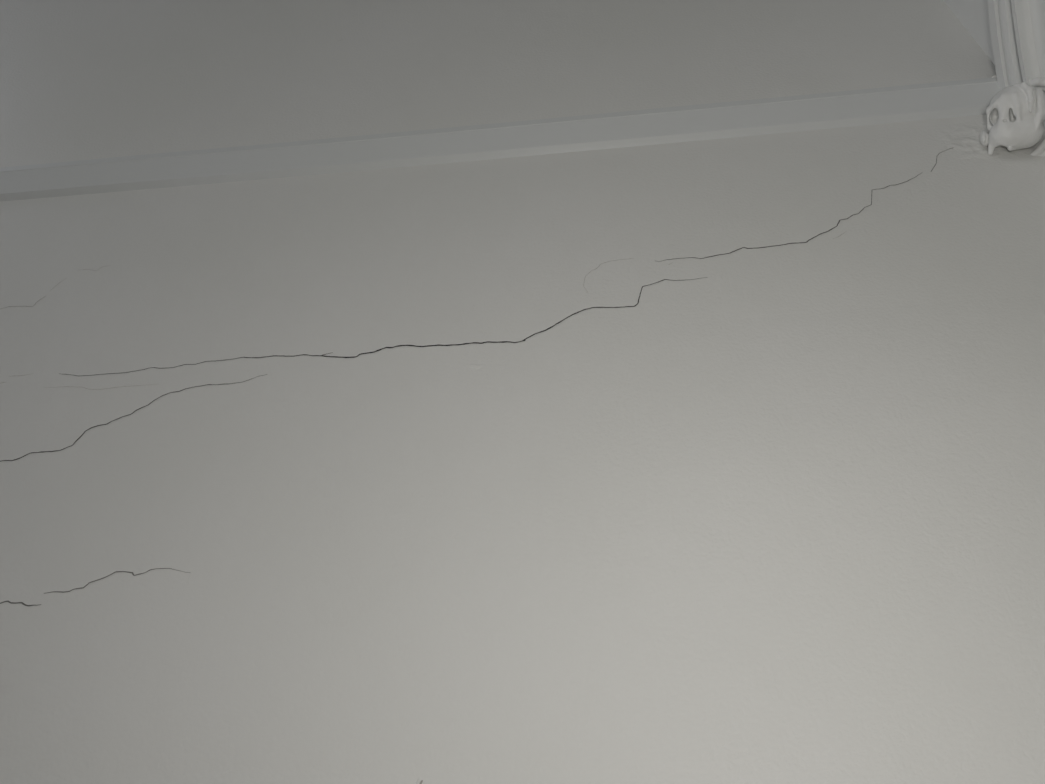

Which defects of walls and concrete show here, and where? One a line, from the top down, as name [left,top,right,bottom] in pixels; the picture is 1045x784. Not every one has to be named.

crack [2,147,954,461]
crack [0,568,190,606]